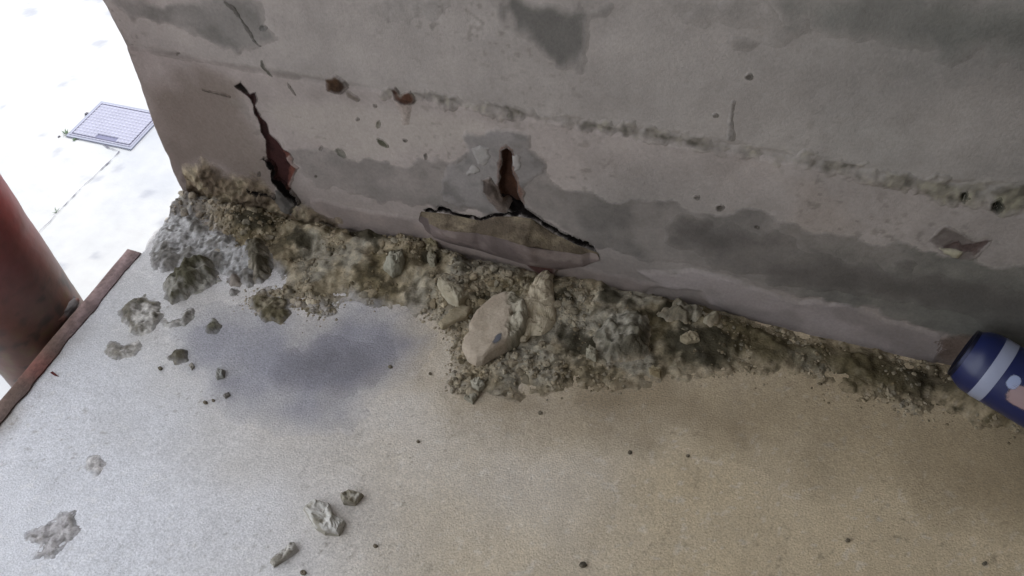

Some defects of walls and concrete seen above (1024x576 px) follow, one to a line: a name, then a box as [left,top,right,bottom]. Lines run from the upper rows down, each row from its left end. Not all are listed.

water stain [490,0,614,75]
crack [201,0,301,214]
corrosion [325,74,360,102]
corrosion [391,86,415,125]
spalling [180,155,343,229]
water stain [281,141,534,272]
spalling [482,144,526,213]
crack [422,192,597,252]
water stain [524,148,1024,363]
peeling [927,225,993,261]
water stain [169,300,439,438]